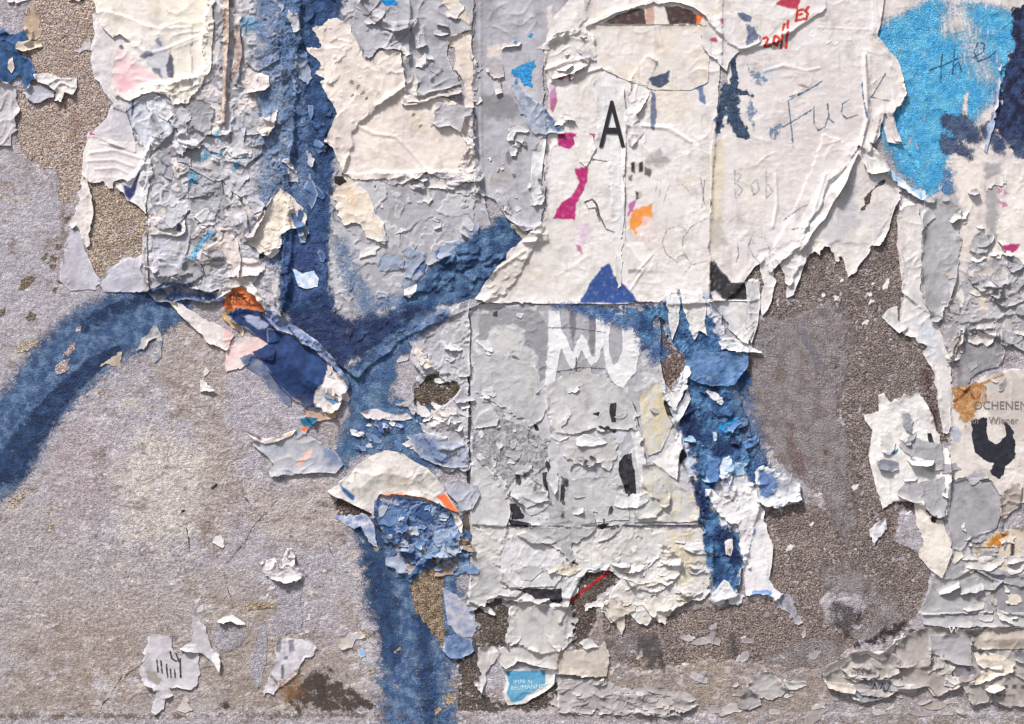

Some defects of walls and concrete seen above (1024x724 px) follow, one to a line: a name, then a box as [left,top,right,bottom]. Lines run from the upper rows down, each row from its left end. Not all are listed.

peeling [355,0,386,25]
peeling [389,4,464,127]
spalling [16,0,327,284]
peeling [386,55,484,204]
peeling [488,114,575,177]
peeling [969,174,1006,195]
spalling [18,276,36,290]
spalling [41,244,62,292]
peeling [323,366,350,413]
spalling [333,206,1024,724]